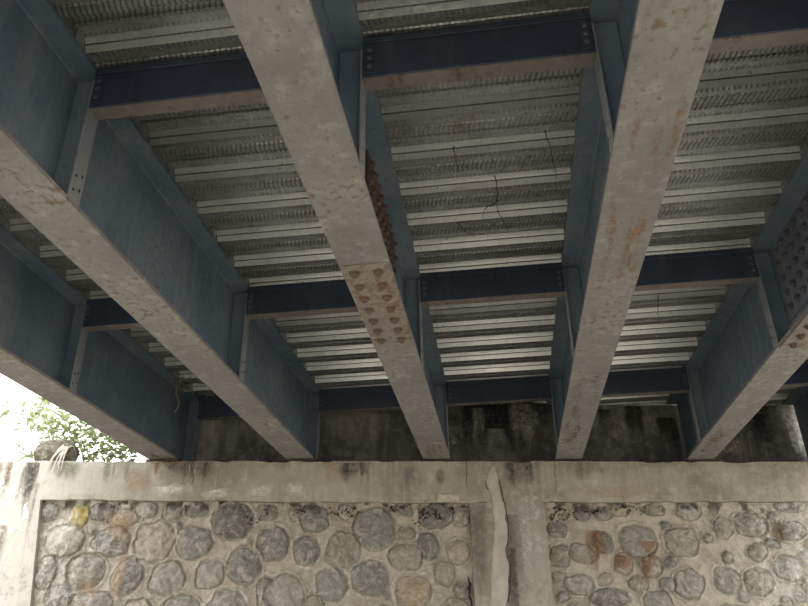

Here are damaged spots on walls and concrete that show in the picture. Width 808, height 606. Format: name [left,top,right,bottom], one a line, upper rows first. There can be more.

damp [448,402,548,446]
damp [22,462,40,496]
crack [466,468,511,606]